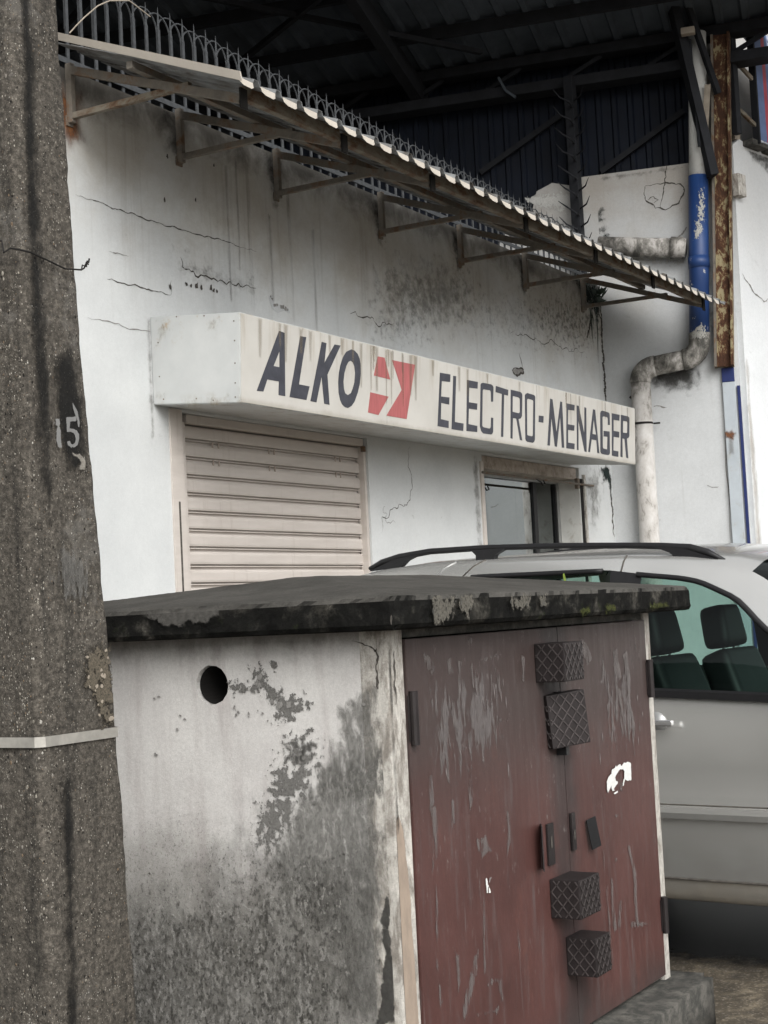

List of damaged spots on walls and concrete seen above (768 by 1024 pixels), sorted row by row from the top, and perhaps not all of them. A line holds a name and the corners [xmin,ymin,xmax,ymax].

crack [77,195,252,250]
crack [644,166,687,237]
crack [108,259,251,295]
spalling [83,640,114,730]